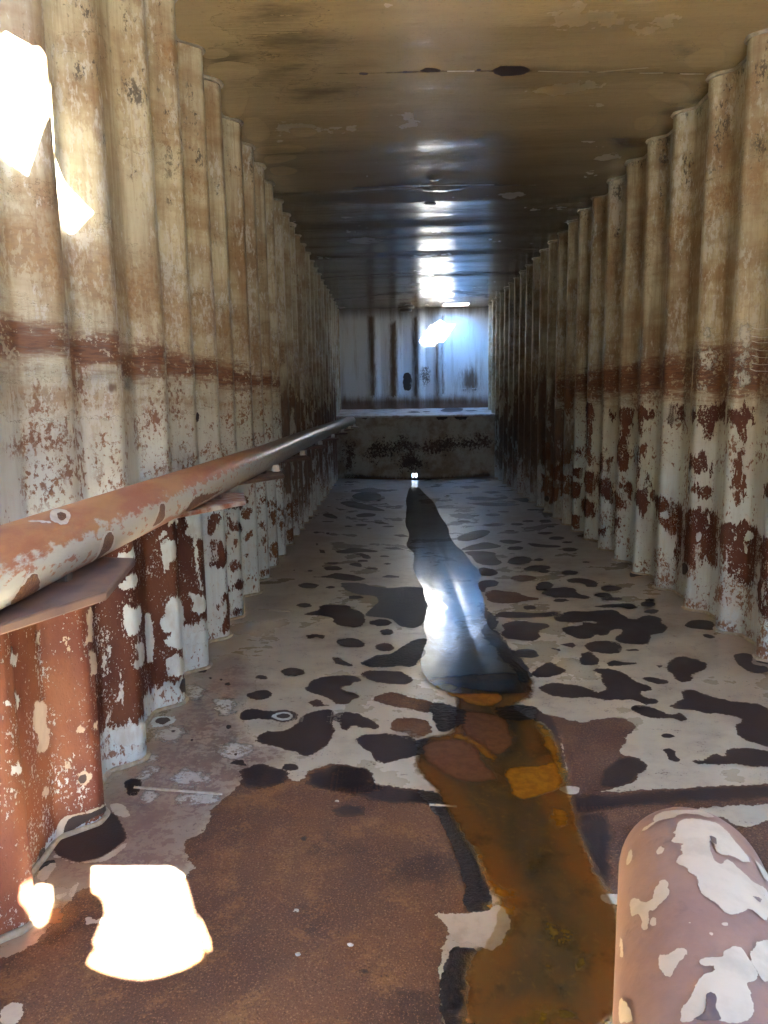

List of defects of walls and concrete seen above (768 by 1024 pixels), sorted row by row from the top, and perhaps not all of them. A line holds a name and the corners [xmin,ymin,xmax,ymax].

corrosion [0,155,768,547]
corrosion [652,546,768,659]
peeling [0,490,434,935]
corrosion [0,653,492,1024]
peeling [629,880,670,930]
peeling [639,810,768,935]
peeling [0,1002,24,1024]
peeling [618,998,633,1024]
peeling [658,948,687,977]
peeling [680,940,768,1023]